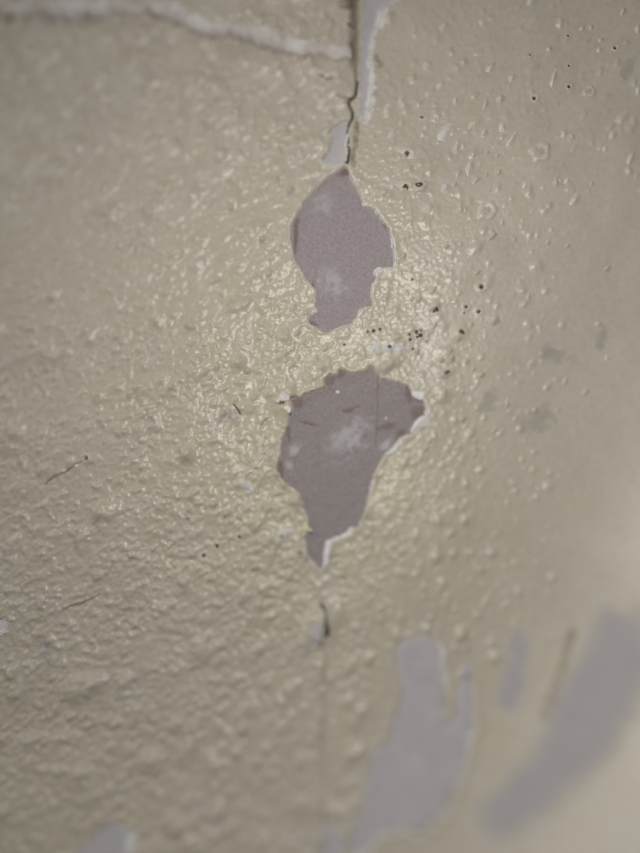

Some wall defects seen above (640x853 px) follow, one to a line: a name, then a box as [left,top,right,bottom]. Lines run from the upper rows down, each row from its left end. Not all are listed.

crack [318,0,384,165]
peeling [357,0,398,124]
peeling [288,118,396,334]
peeling [275,364,431,571]